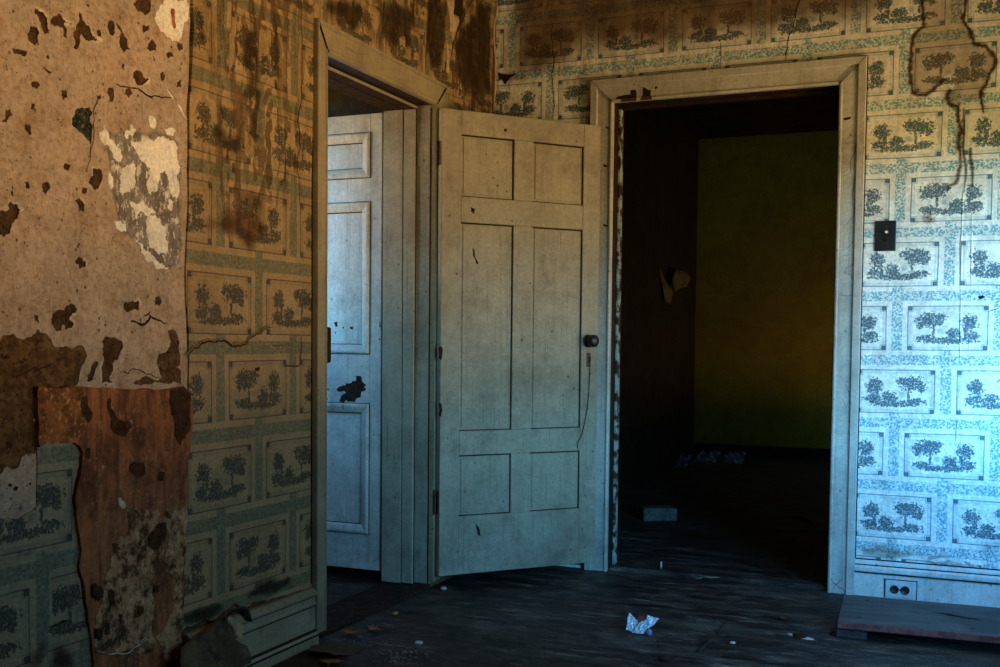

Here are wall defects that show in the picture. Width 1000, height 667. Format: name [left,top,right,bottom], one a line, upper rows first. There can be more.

crack [116,84,188,120]
water stain [217,0,297,247]
water stain [373,0,491,113]
peeling [75,115,182,269]
flaking render [0,304,122,473]
crack [131,313,167,326]
flaking render [134,329,180,385]
crack [186,325,302,367]